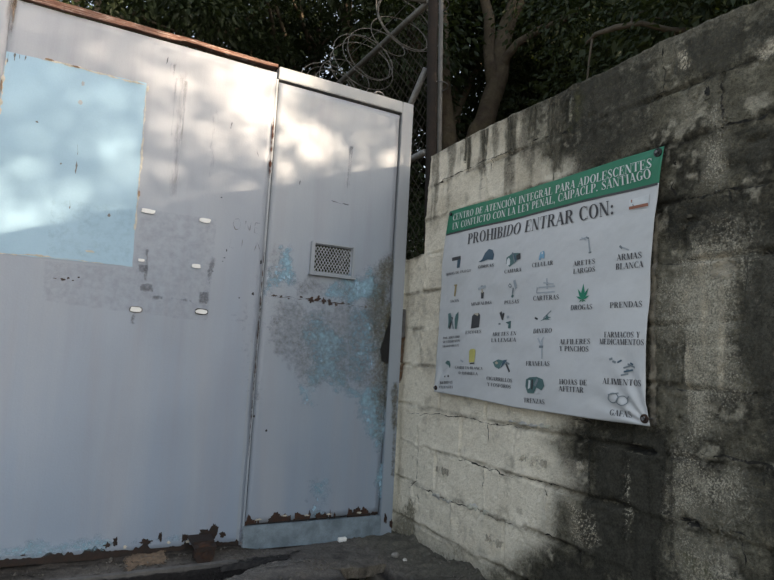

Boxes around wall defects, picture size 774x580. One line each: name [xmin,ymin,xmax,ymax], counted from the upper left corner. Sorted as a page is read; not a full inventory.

damp [507,114,516,161]
damp [548,50,658,180]
corrosion [252,247,376,339]
damp [540,104,774,580]
corrosion [0,532,193,567]
corrosion [199,524,239,546]
corrosion [244,510,336,526]
corrosion [347,506,378,517]